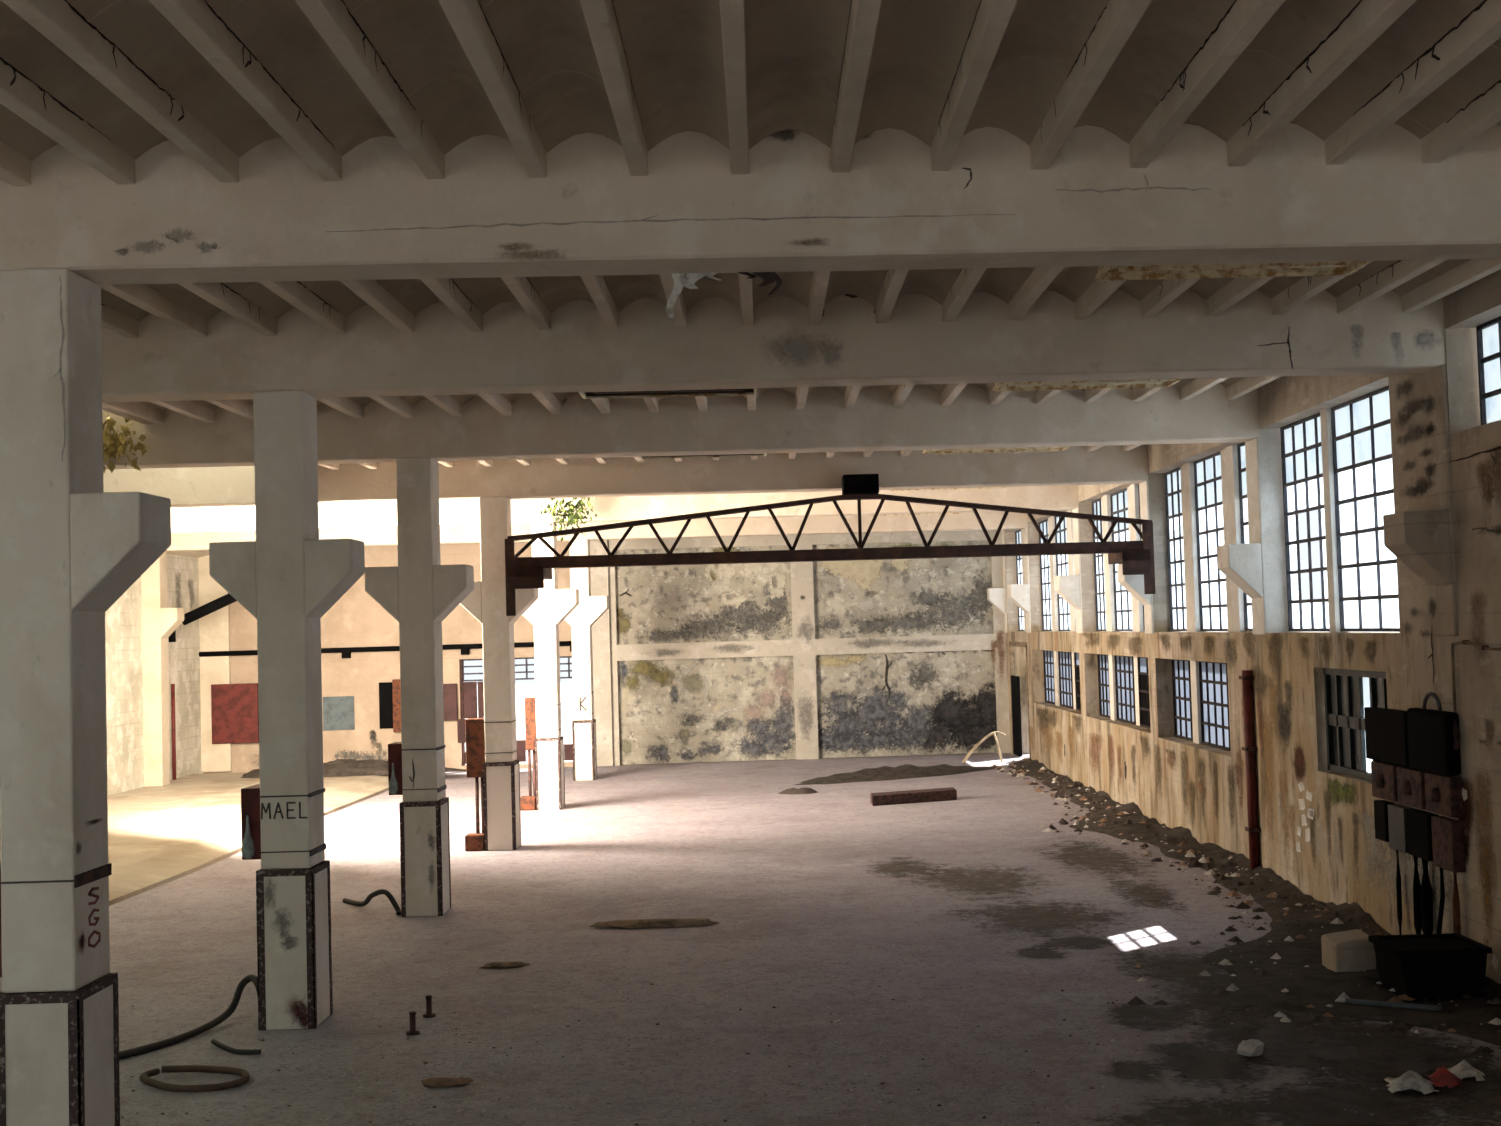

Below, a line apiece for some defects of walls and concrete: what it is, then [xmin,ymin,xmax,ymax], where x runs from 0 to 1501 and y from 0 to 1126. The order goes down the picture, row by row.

leakage [616,572,997,761]
leakage [1038,709,1081,729]
leakage [1131,736,1234,819]
leakage [1310,792,1439,903]